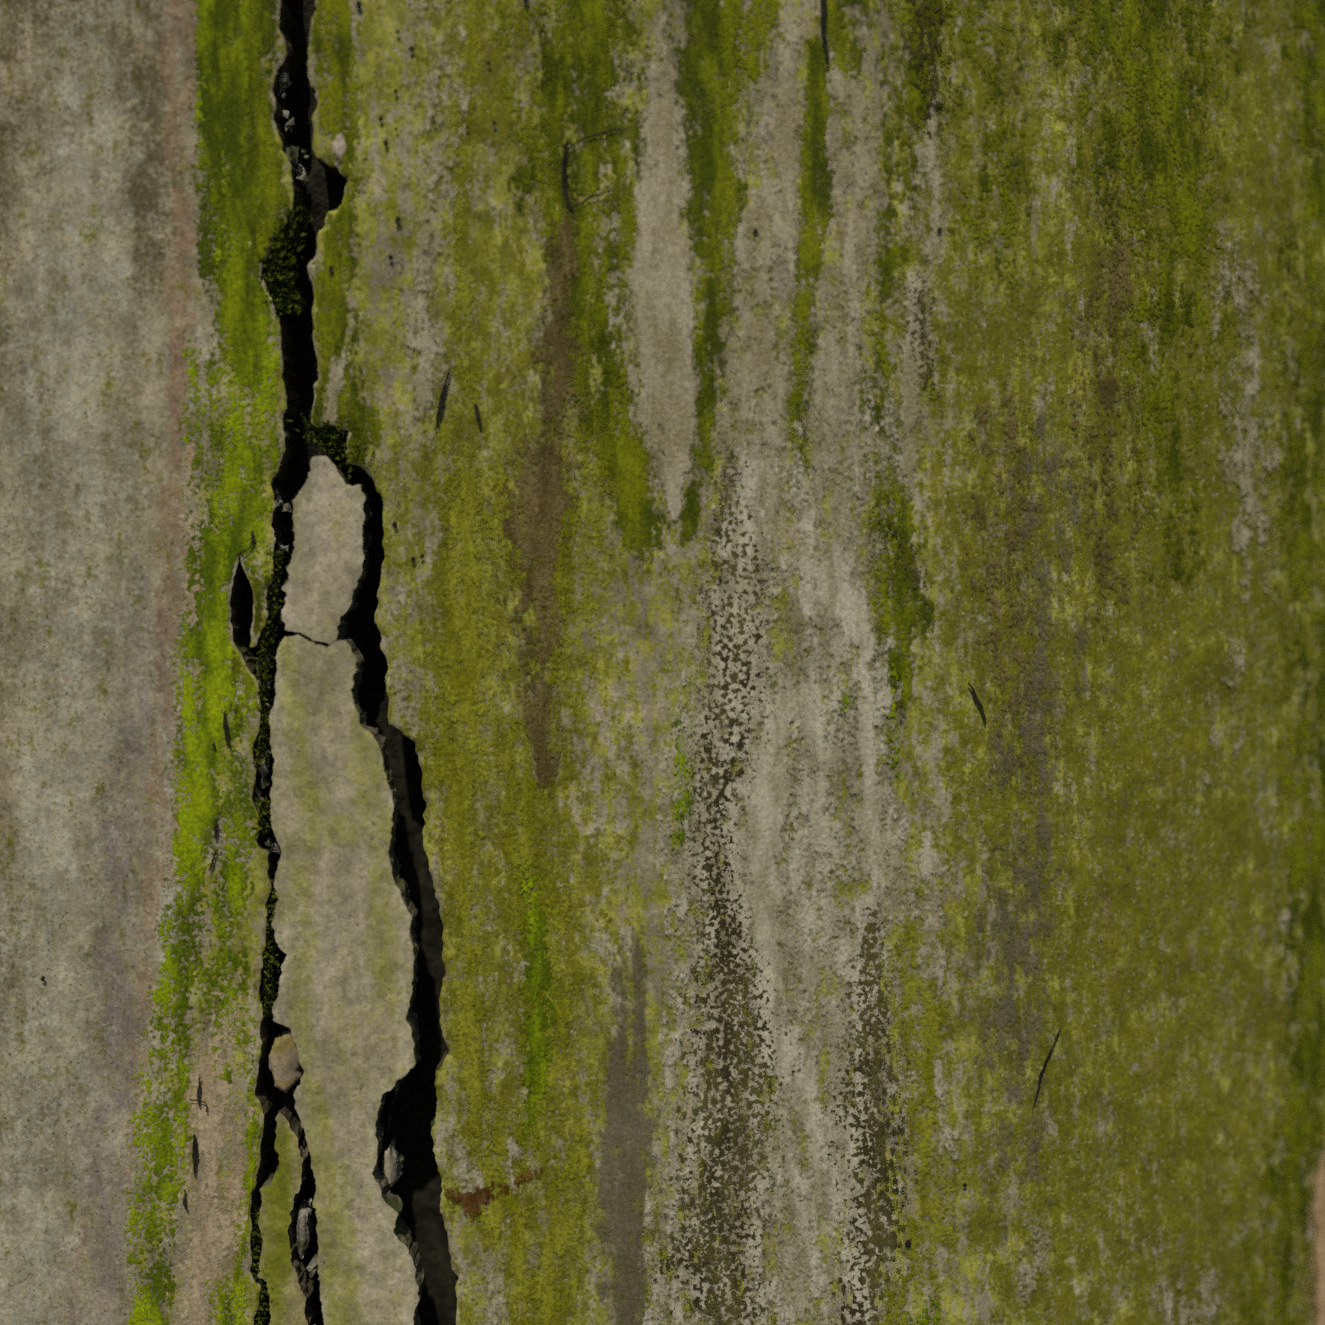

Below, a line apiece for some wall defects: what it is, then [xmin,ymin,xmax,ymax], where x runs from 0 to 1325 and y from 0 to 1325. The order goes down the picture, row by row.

crack [239,0,457,1325]
crack [212,710,231,749]
crack [209,819,218,871]